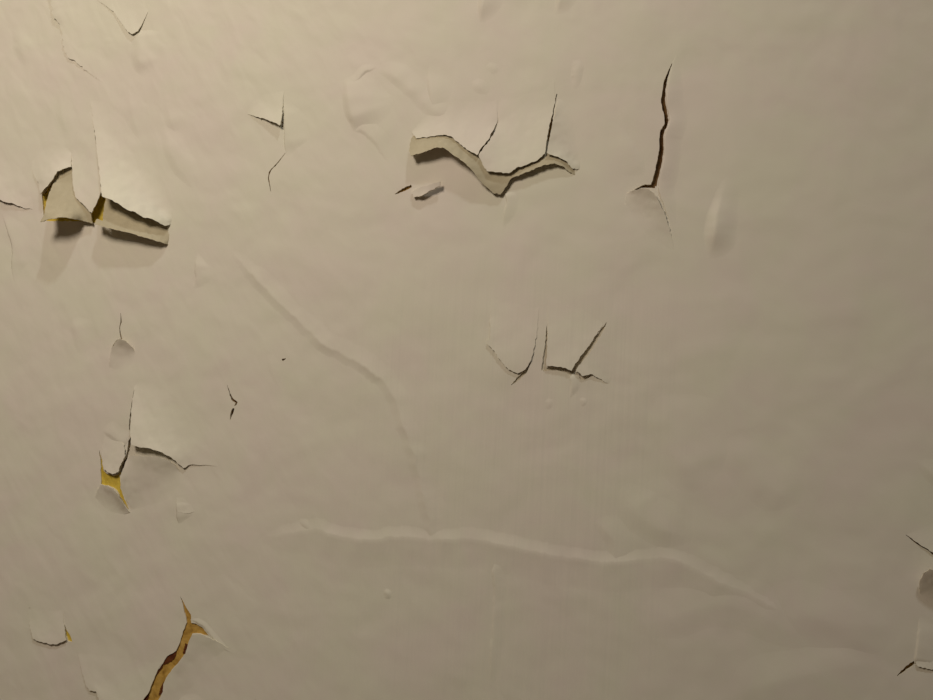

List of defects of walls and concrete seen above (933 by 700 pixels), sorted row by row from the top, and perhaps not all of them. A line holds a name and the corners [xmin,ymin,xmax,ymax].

peeling [98,0,161,76]
peeling [32,100,173,244]
peeling [397,182,440,198]
peeling [409,80,580,229]
crack [608,54,687,250]
peeling [542,294,614,407]
peeling [95,382,218,523]
peeling [29,607,72,644]
peeling [78,600,233,700]
peeling [919,569,933,606]